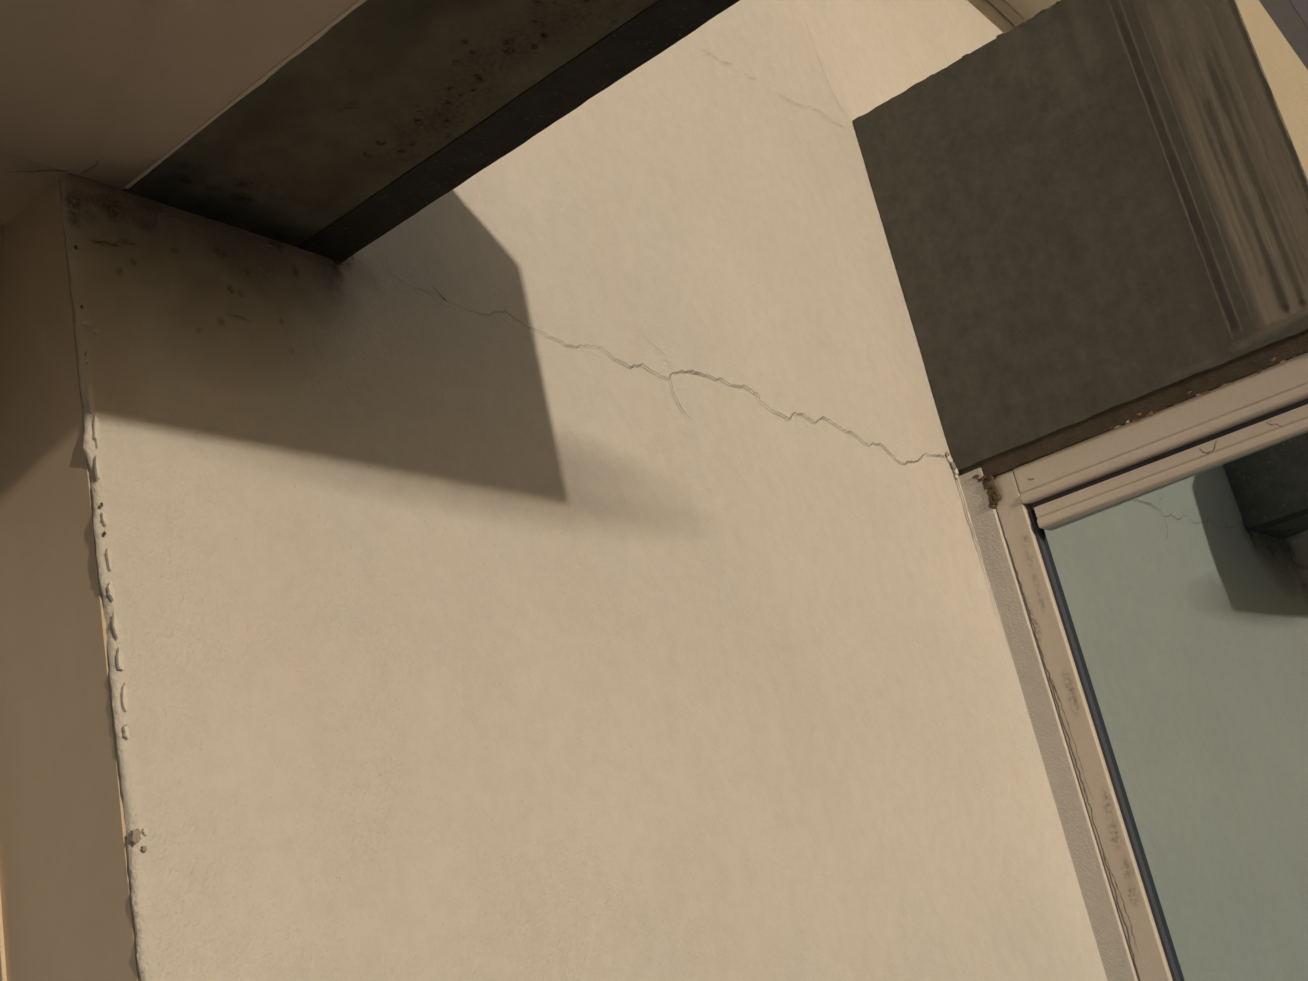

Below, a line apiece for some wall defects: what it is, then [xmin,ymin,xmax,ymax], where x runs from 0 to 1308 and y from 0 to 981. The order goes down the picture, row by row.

water stain [105,178,301,281]
water stain [1183,36,1308,325]